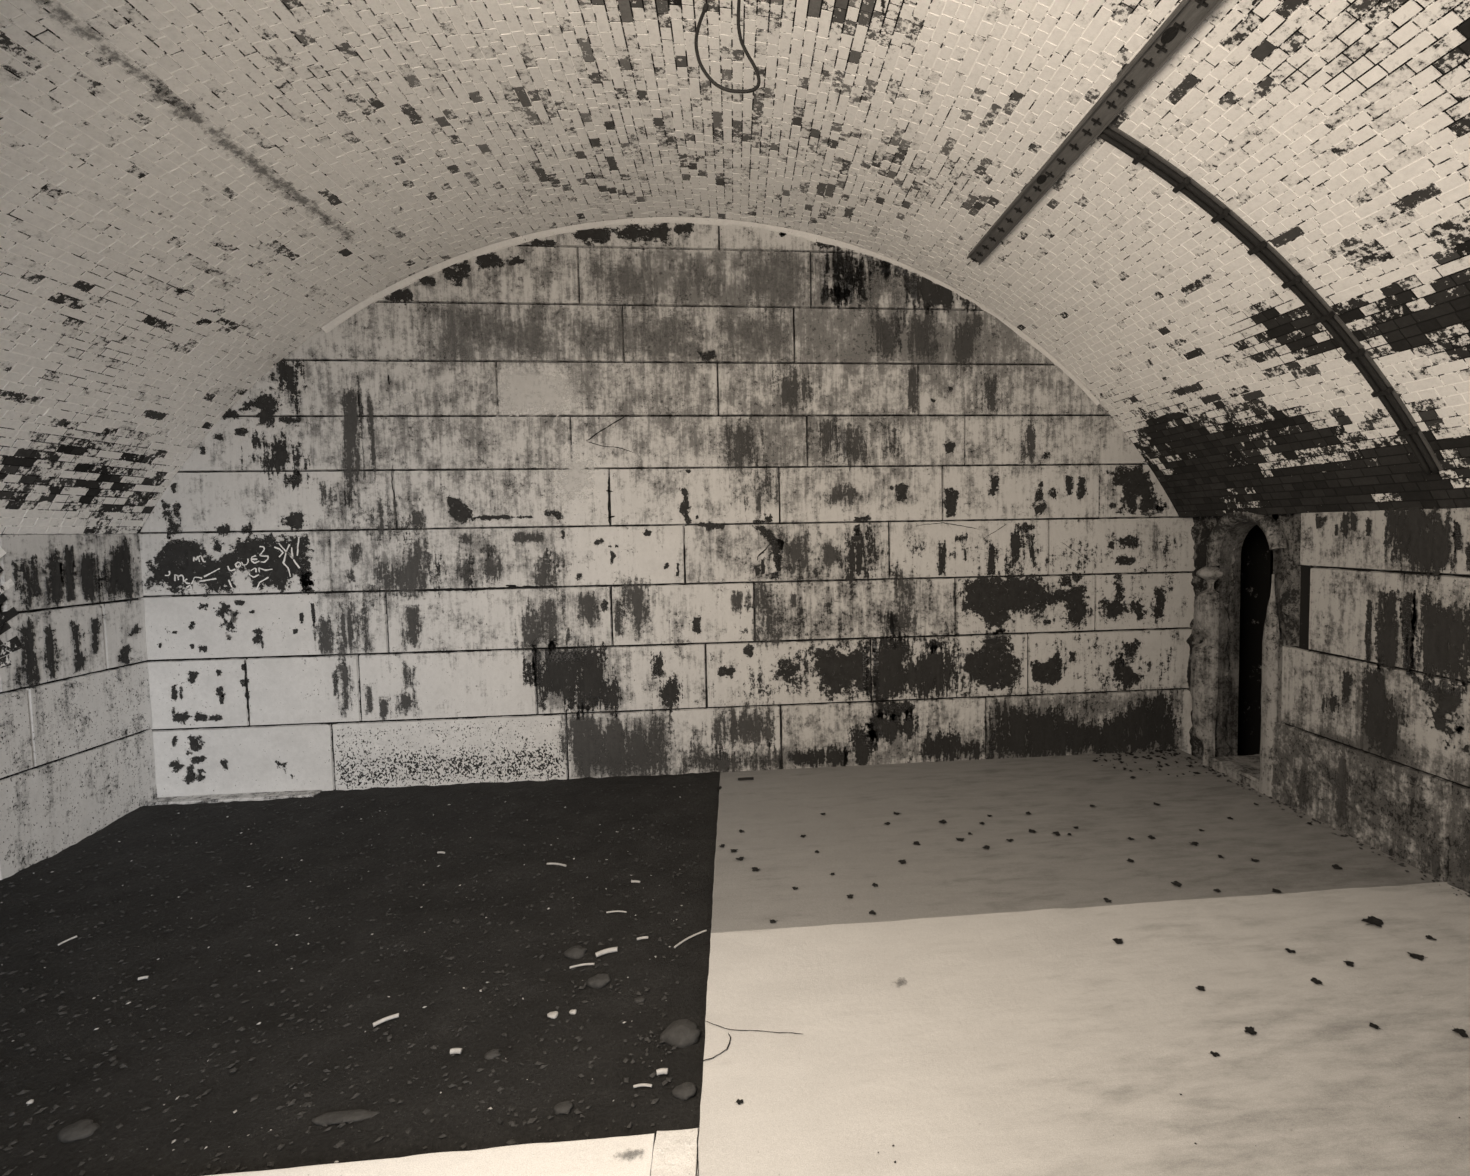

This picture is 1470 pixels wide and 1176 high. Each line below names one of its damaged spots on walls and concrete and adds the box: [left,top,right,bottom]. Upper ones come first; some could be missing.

peeling [1454,241,1470,256]
peeling [1251,306,1320,351]
peeling [1377,276,1470,352]
water stain [340,373,377,504]
water stain [312,585,423,721]
water stain [514,577,652,654]
water stain [730,522,921,650]
water stain [1313,505,1470,768]
water stain [556,686,1184,778]
water stain [1332,756,1351,819]